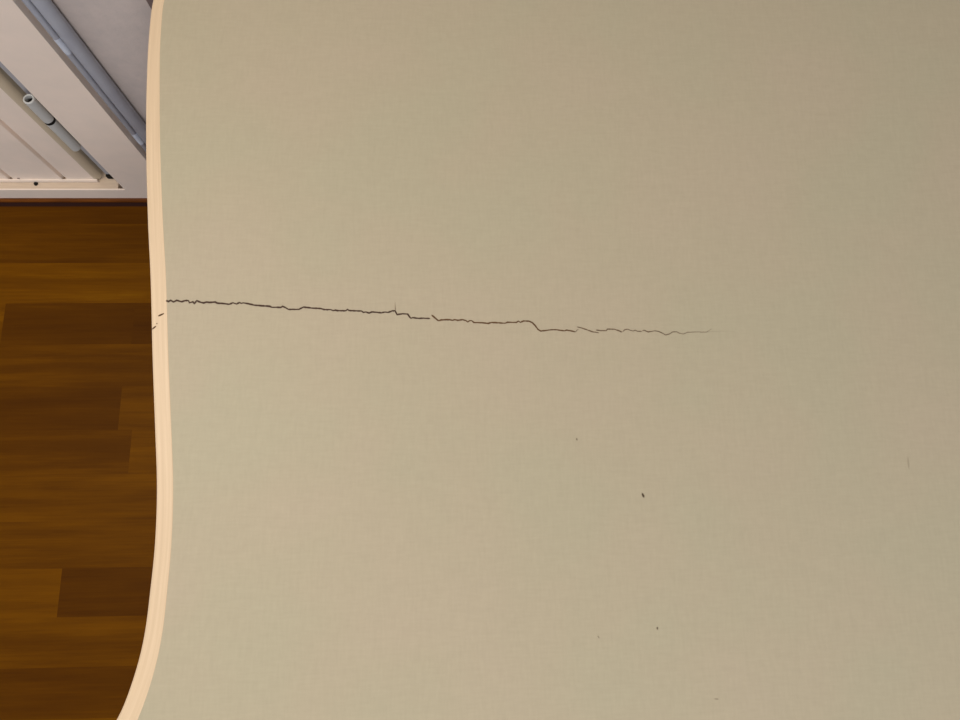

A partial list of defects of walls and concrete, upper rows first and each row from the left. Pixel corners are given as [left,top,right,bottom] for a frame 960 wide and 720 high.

crack [152,299,672,335]